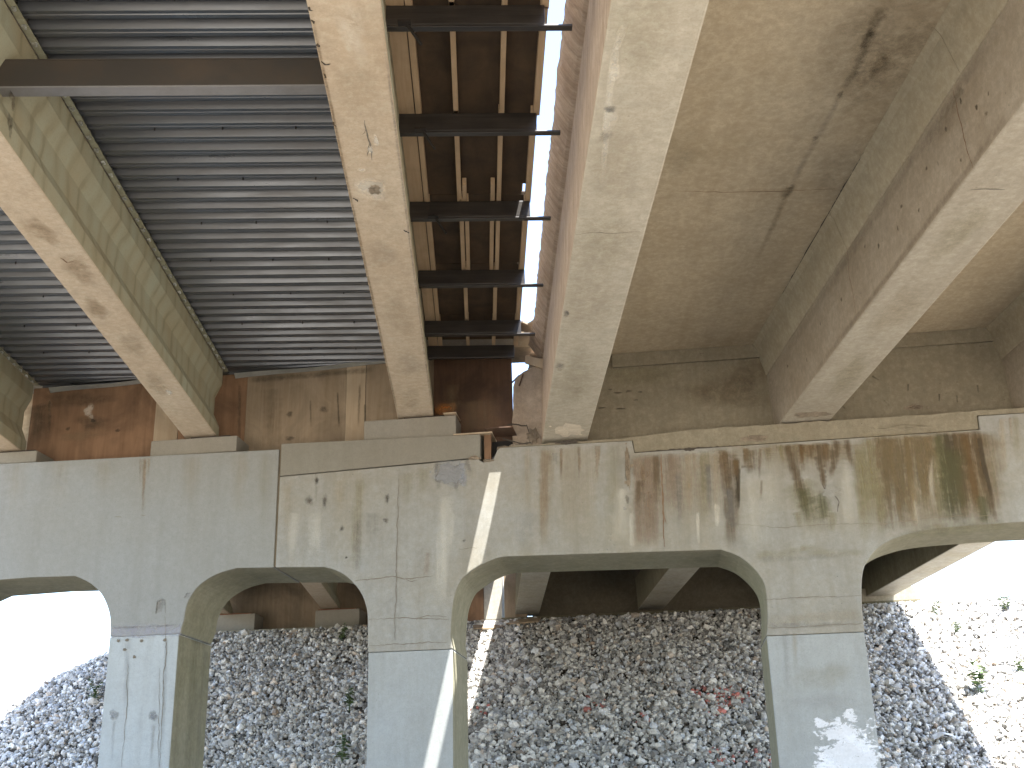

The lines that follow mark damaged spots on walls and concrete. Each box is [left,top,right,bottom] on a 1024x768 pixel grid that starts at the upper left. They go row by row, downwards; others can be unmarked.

corrosion [744,437,935,514]
crack [356,480,448,646]
crack [120,675,128,766]
crack [158,626,167,766]